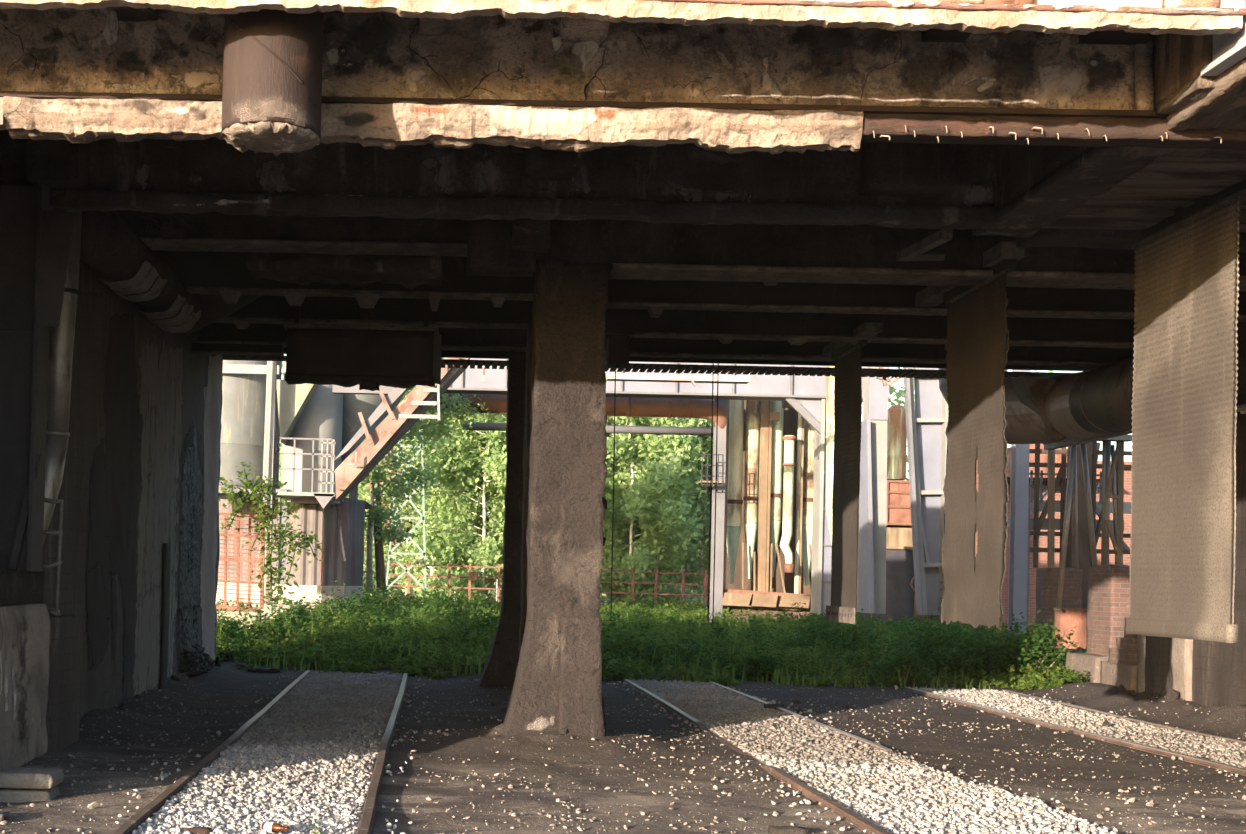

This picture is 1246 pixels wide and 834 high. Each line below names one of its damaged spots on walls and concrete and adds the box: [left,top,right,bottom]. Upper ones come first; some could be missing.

crack [0,23,37,120]
crack [409,26,528,99]
crack [584,50,606,100]
leakage [792,27,896,76]
leakage [900,49,966,99]
leakage [964,43,1125,109]